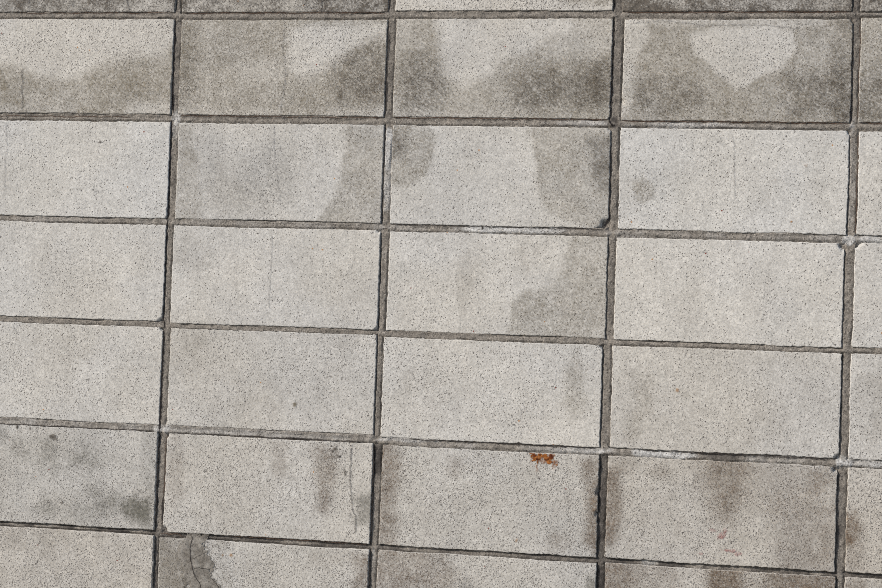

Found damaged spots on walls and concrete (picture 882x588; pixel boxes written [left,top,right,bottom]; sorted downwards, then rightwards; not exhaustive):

water stain [2,0,128,12]
water stain [305,0,389,12]
water stain [623,0,882,12]
crack [396,27,882,126]
crack [381,131,612,230]
crack [853,138,861,233]
crack [0,0,390,588]
crack [413,439,597,449]
rust [529,453,557,466]